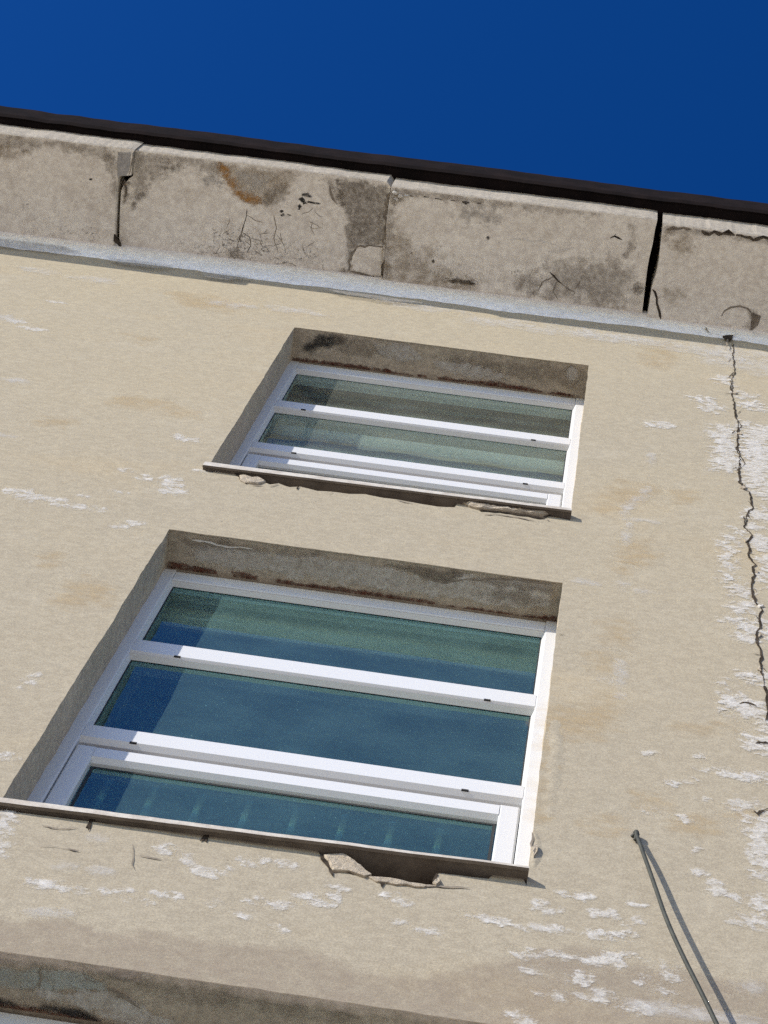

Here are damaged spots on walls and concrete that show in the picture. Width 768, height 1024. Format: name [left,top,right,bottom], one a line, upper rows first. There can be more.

crack [113,234,122,247]
crack [215,186,360,270]
leakage [337,180,387,256]
spalling [348,245,383,277]
crack [652,289,661,319]
peeling [463,501,550,521]
crack [726,344,768,744]
rust [167,562,217,575]
rust [276,579,557,621]
spalling [237,853,468,919]